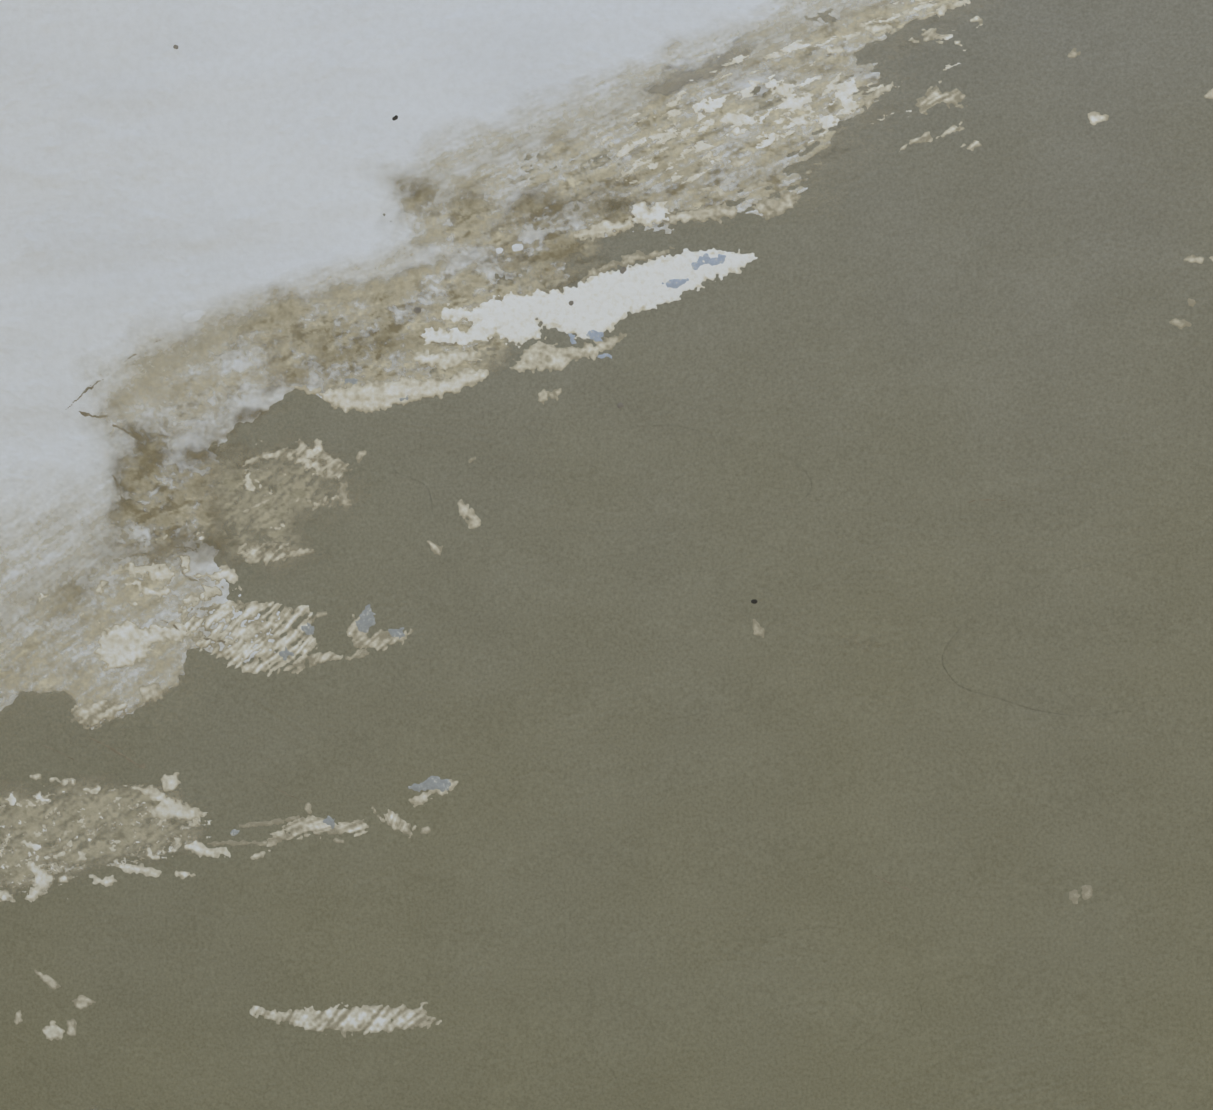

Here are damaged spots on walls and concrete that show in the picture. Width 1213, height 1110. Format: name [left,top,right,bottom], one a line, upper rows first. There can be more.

peeling [857,0,983,46]
peeling [899,81,982,152]
peeling [573,180,801,242]
peeling [294,246,758,413]
peeling [242,438,367,513]
peeling [457,499,481,529]
peeling [79,523,413,677]
peeling [130,772,431,860]
peeling [408,776,458,807]
peeling [0,840,196,902]
peeling [42,995,96,1041]
peeling [250,1002,442,1038]